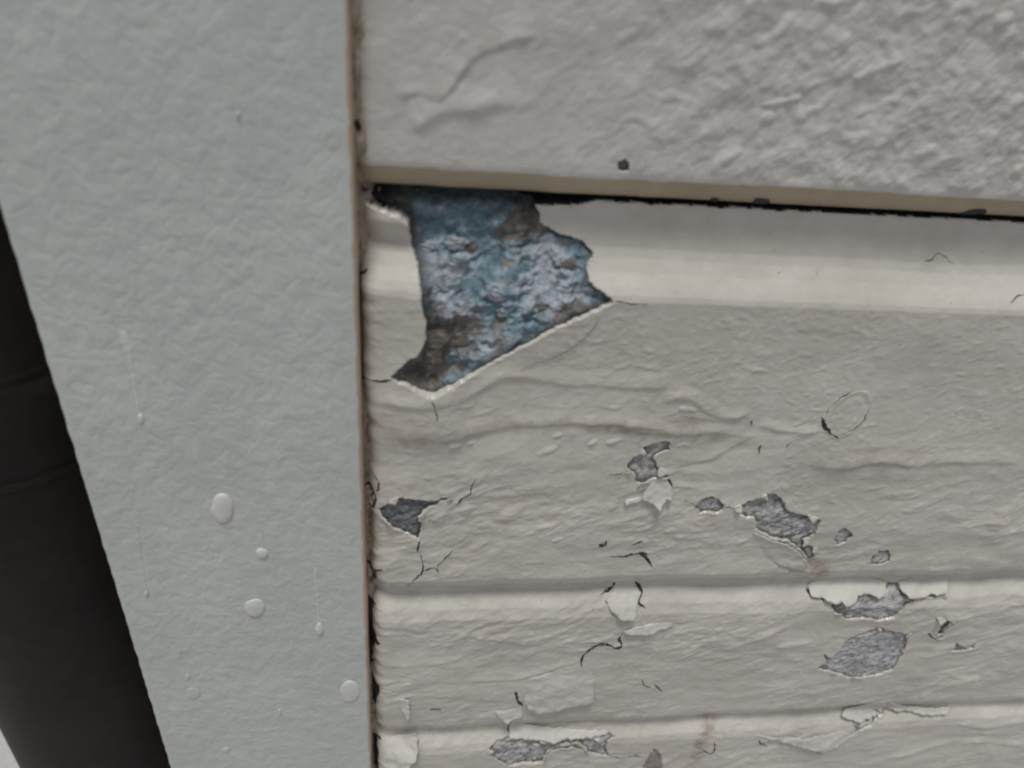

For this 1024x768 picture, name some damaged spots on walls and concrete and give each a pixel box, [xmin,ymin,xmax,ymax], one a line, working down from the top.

peeling [371,183,615,392]
crack [821,389,870,439]
peeling [623,439,673,513]
peeling [377,496,455,542]
crack [410,541,453,584]
peeling [691,492,823,571]
crack [580,635,622,667]
peeling [808,549,950,680]
peeling [486,666,617,768]